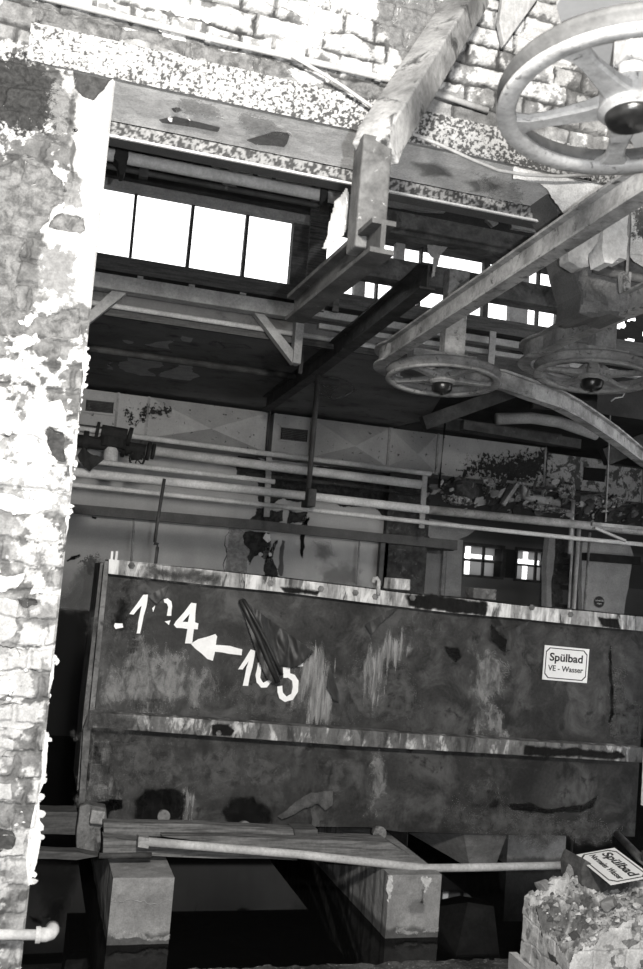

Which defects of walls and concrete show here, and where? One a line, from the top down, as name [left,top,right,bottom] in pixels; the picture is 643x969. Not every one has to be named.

flaking render [73,71,112,100]
damp [631,206,643,240]
flaking render [0,154,91,483]
peeling [0,456,53,515]
peeling [0,570,44,644]
rust [598,617,621,629]
rust [406,594,510,738]
rust [524,647,640,759]
peeling [0,651,59,886]
spalling [534,879,549,891]
flaking render [622,921,638,949]